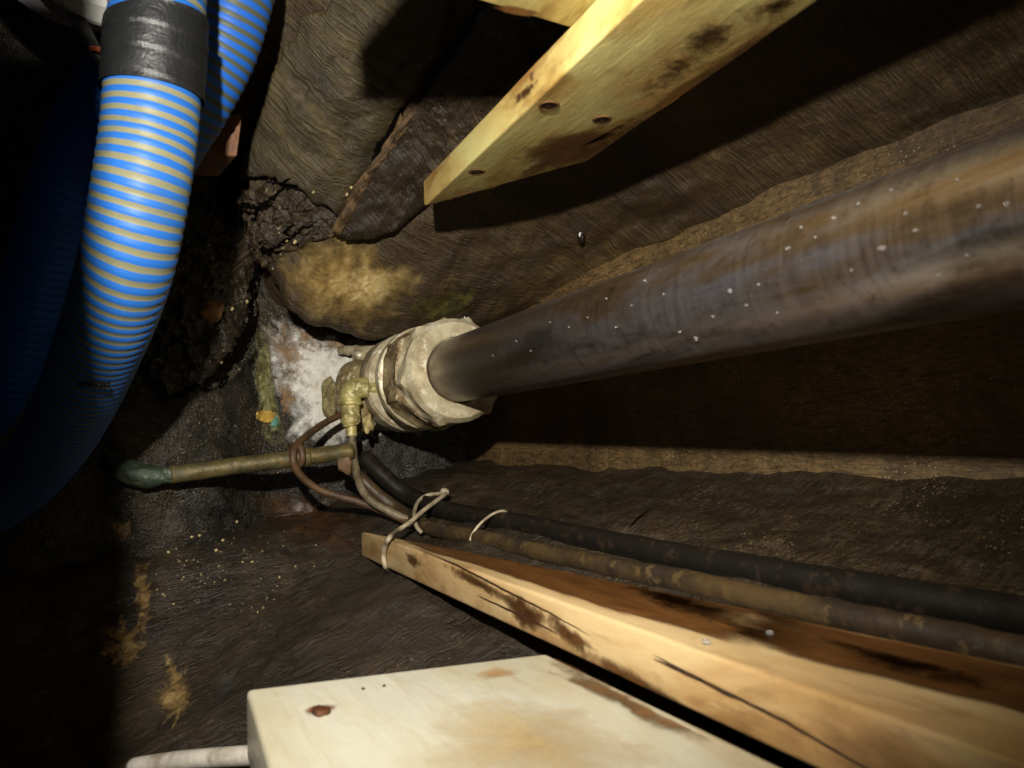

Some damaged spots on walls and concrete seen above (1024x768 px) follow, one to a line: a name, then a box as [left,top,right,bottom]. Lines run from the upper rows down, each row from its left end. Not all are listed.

crack [164,176,331,400]
leakage [347,271,382,300]
leakage [267,324,373,444]